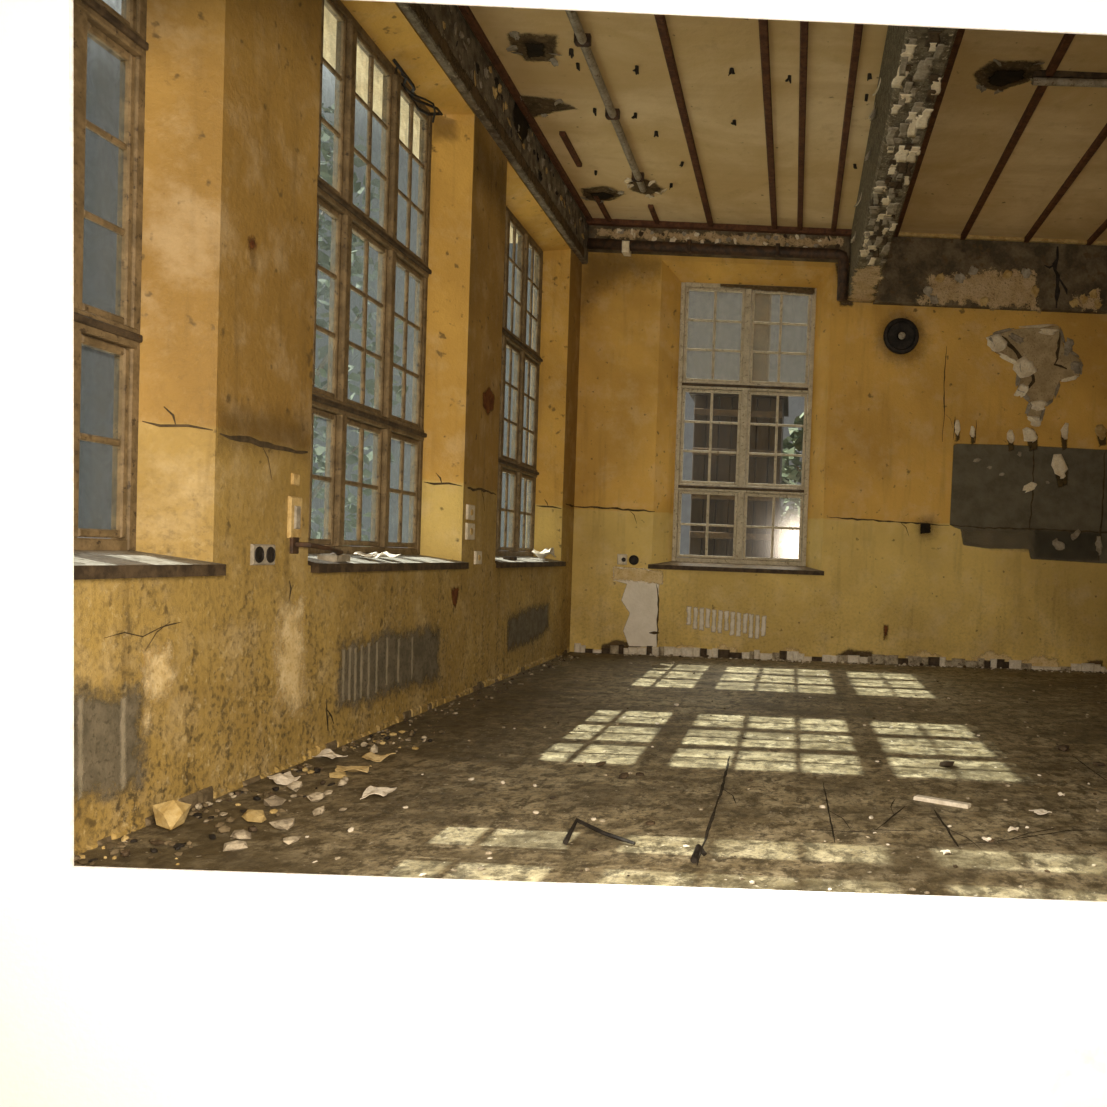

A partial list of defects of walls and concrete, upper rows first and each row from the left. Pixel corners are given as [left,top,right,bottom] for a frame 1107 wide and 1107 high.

peeling [471,31,946,302]
crack [142,406,308,478]
flaking render [917,264,1107,563]
flaking render [602,567,663,648]
flaking render [836,649,872,657]